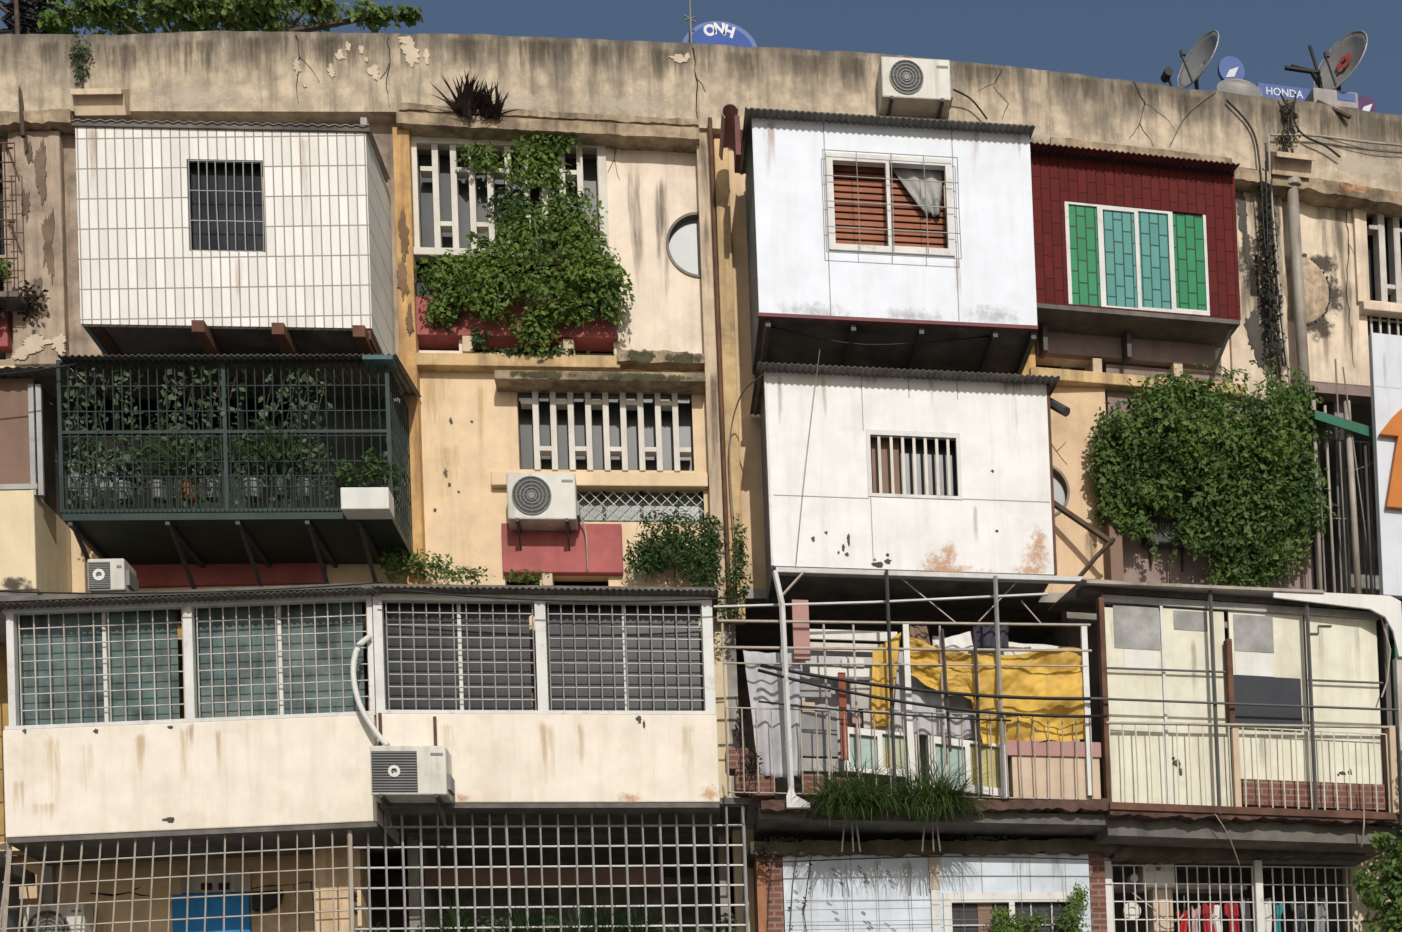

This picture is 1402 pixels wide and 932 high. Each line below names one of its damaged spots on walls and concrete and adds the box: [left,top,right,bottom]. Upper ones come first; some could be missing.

peeling [327,41,379,81]
peeling [398,35,430,68]
water stain [492,94,545,109]
crack [1131,81,1179,144]
water stain [1032,131,1066,144]
spalling [12,139,67,361]
water stain [1238,198,1286,386]
water stain [1306,209,1343,338]
rust [928,545,962,572]
rust [1019,534,1045,573]